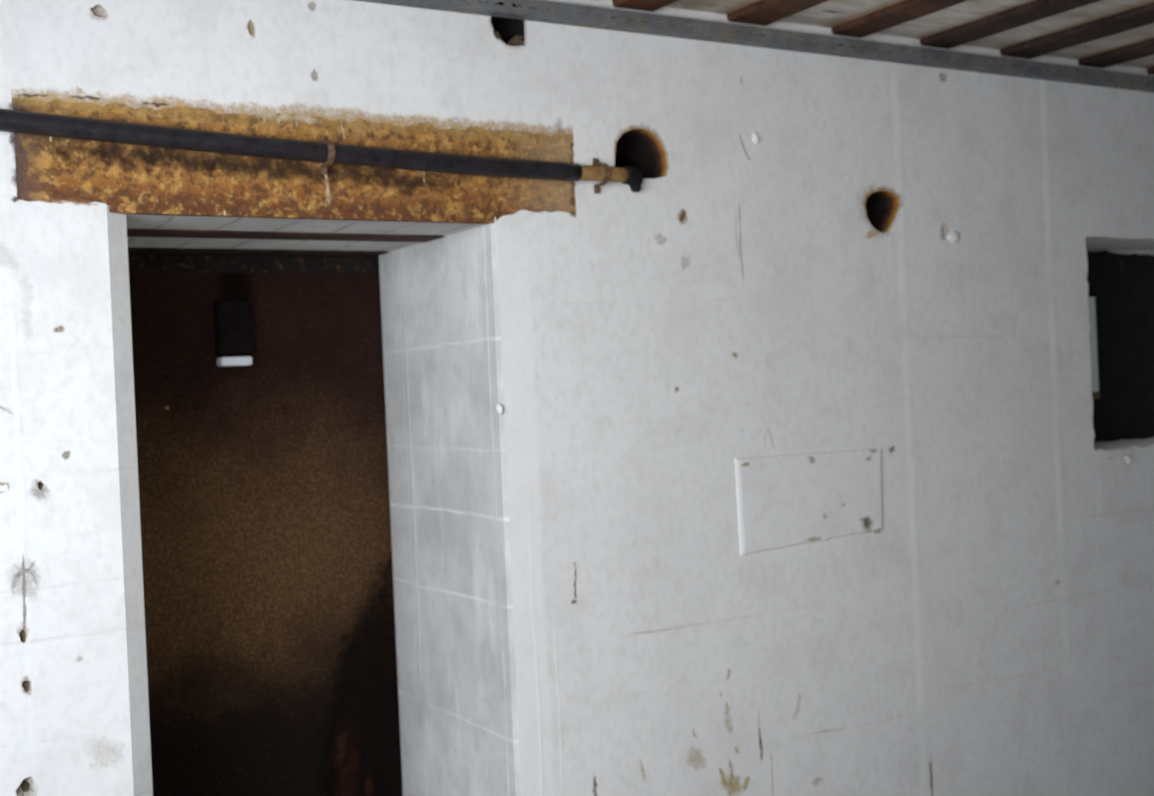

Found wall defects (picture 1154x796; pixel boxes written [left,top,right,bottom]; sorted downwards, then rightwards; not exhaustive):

spalling [491,2,525,46]
spalling [615,127,668,179]
spalling [864,188,900,239]
spalling [16,777,35,796]